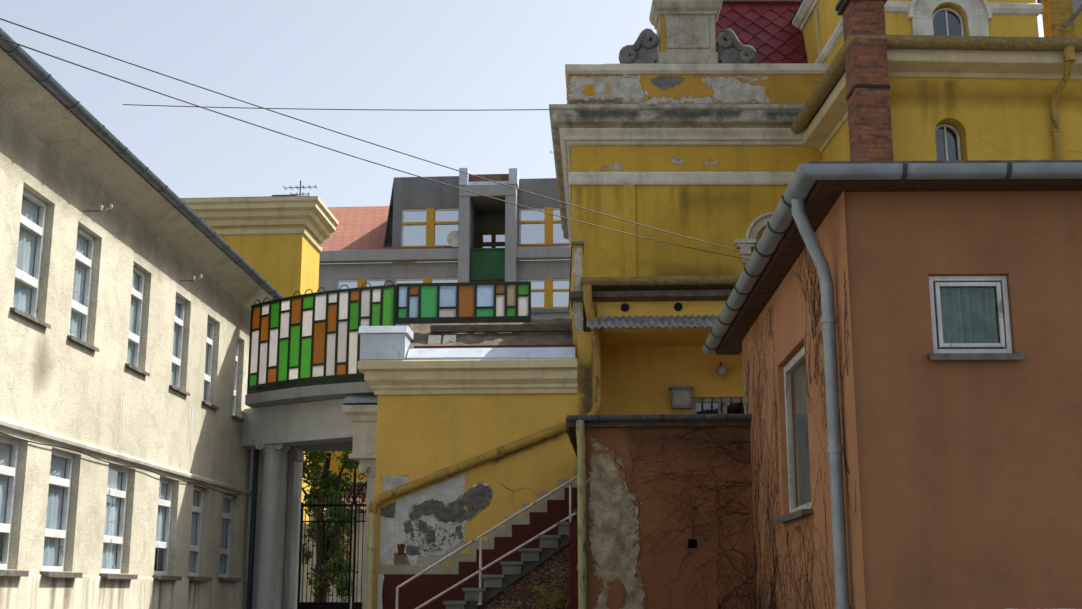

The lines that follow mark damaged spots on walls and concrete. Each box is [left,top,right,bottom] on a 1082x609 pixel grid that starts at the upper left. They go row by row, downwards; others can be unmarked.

peeling [566,74,774,104]
flaking render [377,436,649,609]